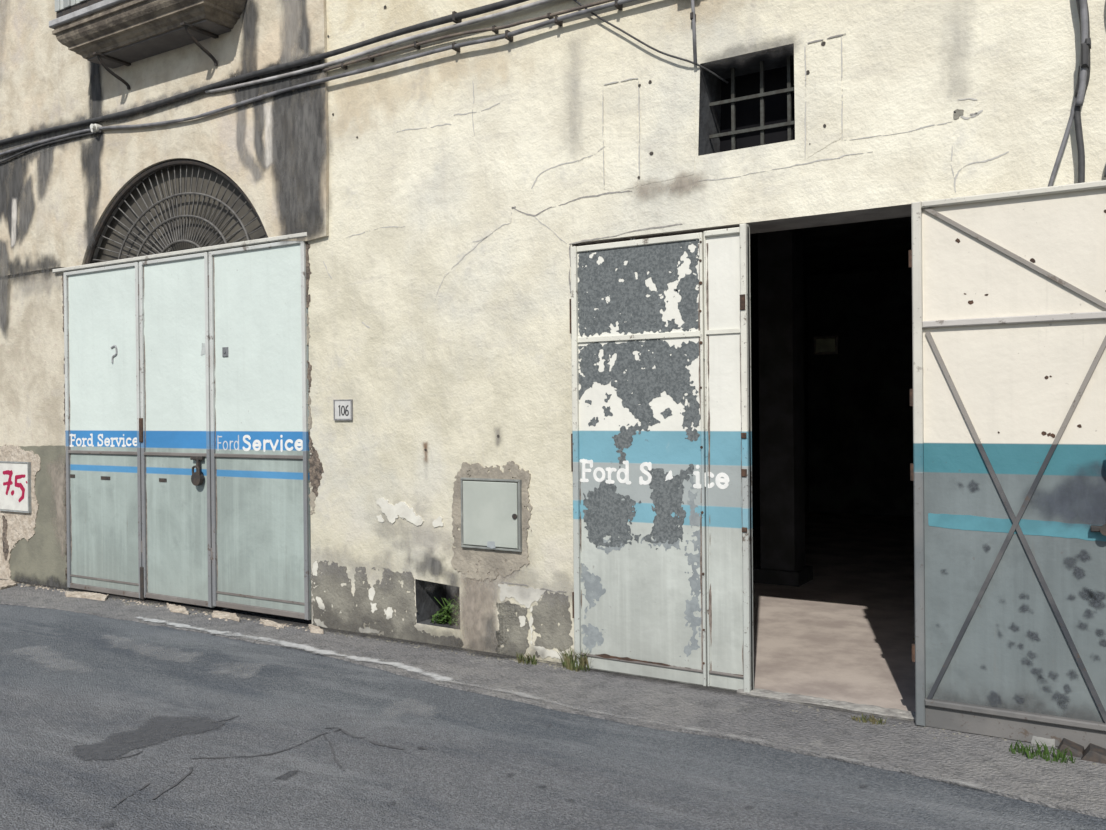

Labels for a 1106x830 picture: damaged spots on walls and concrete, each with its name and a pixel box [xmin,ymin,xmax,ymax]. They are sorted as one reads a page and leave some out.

damp [0,0,326,332]
crack [434,78,682,302]
damp [639,176,698,195]
spalling [307,360,324,515]
peeling [310,560,463,650]
peeling [376,461,606,659]